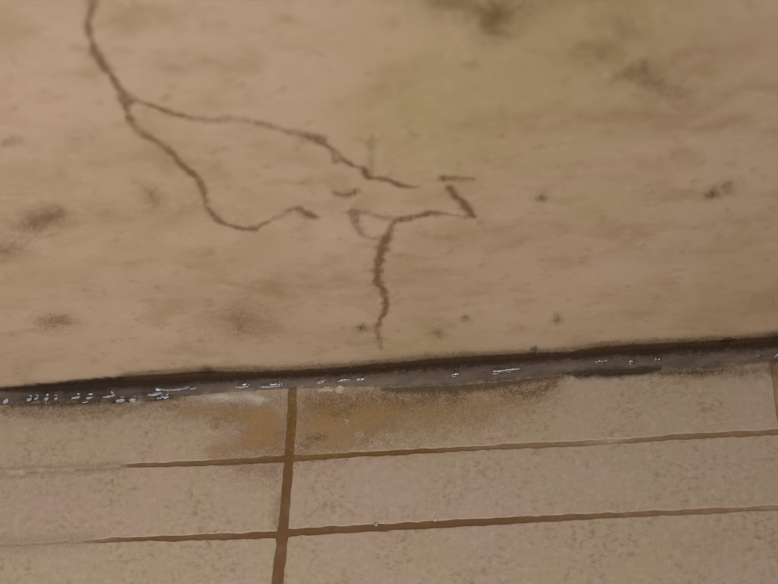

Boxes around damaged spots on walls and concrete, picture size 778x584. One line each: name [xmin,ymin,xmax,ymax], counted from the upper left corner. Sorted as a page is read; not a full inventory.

crack [81,0,477,348]
leakage [0,329,778,425]